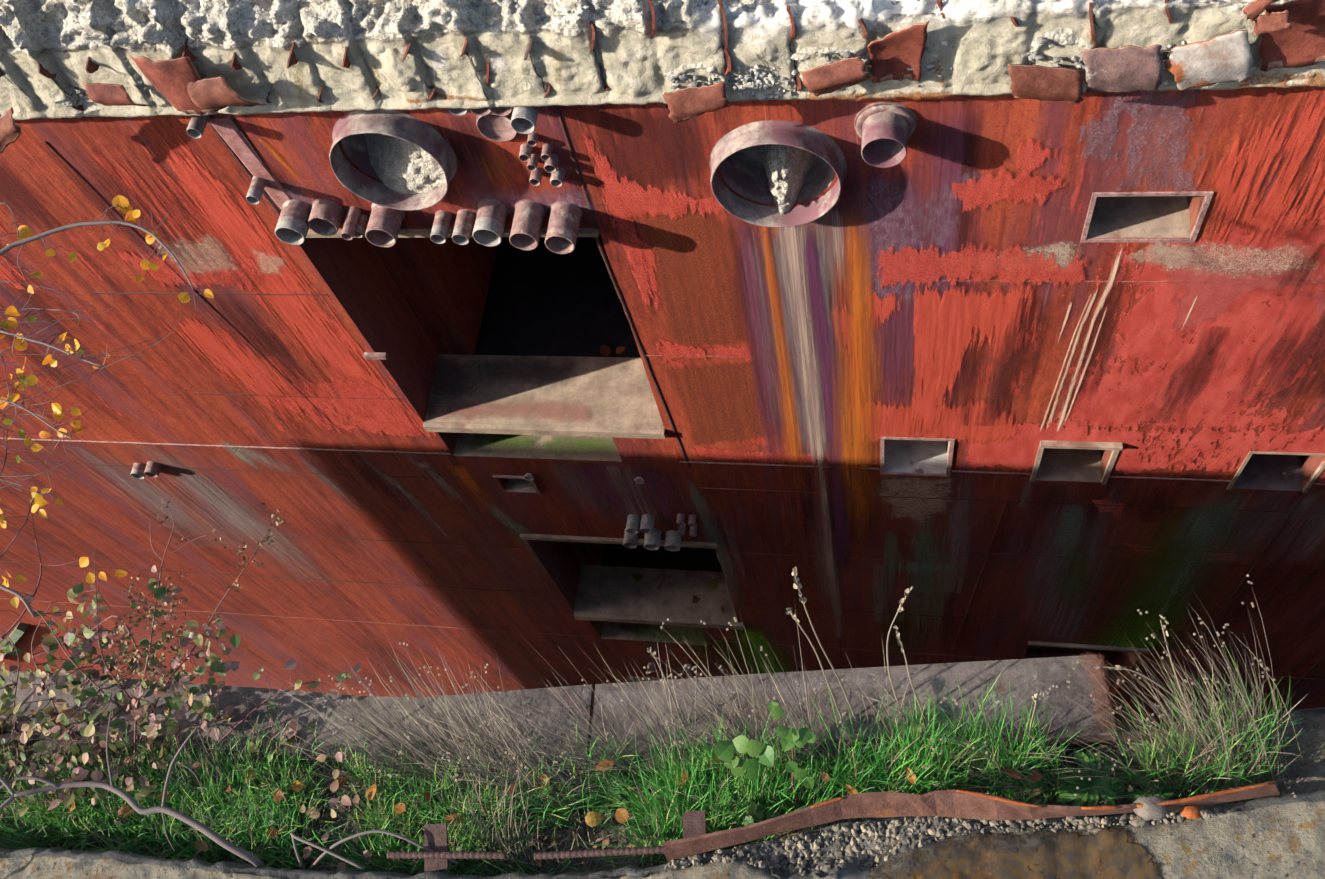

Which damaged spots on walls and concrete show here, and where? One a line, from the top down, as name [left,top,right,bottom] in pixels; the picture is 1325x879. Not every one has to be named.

spalling [55,86,94,107]
spalling [663,63,730,91]
peeling [690,0,1250,80]
rust [428,403,587,420]
peeling [584,125,725,309]
rust [645,211,748,345]
peeling [656,339,787,387]
rust [667,226,798,462]
rust [839,222,871,532]
damp [734,105,977,646]
peeling [830,86,1325,481]
rust [662,781,1280,879]